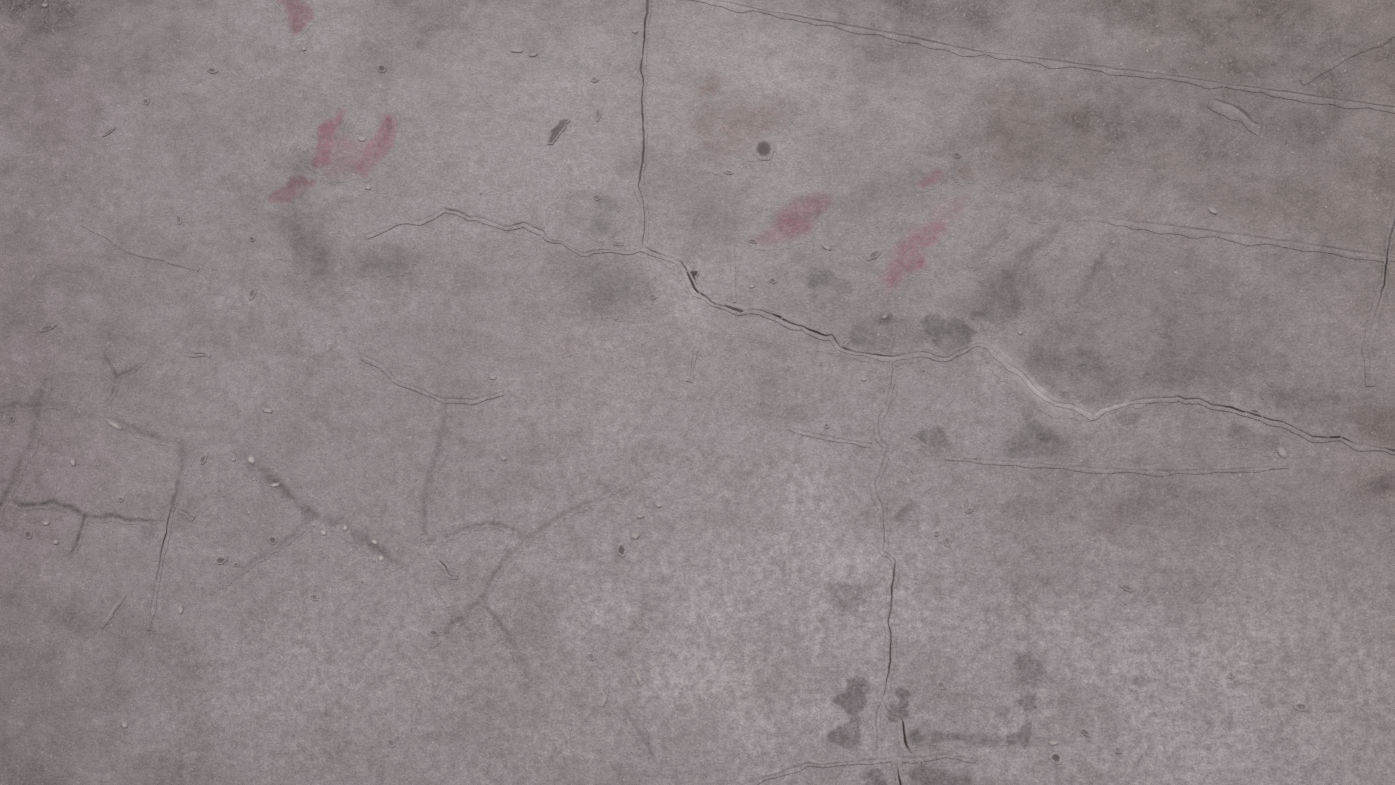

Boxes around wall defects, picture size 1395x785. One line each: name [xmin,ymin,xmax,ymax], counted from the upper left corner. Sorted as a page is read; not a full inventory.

crack [0,346,196,630]
crack [204,402,649,687]
crack [365,0,1395,785]
leakage [824,675,872,752]
leakage [884,647,1052,785]